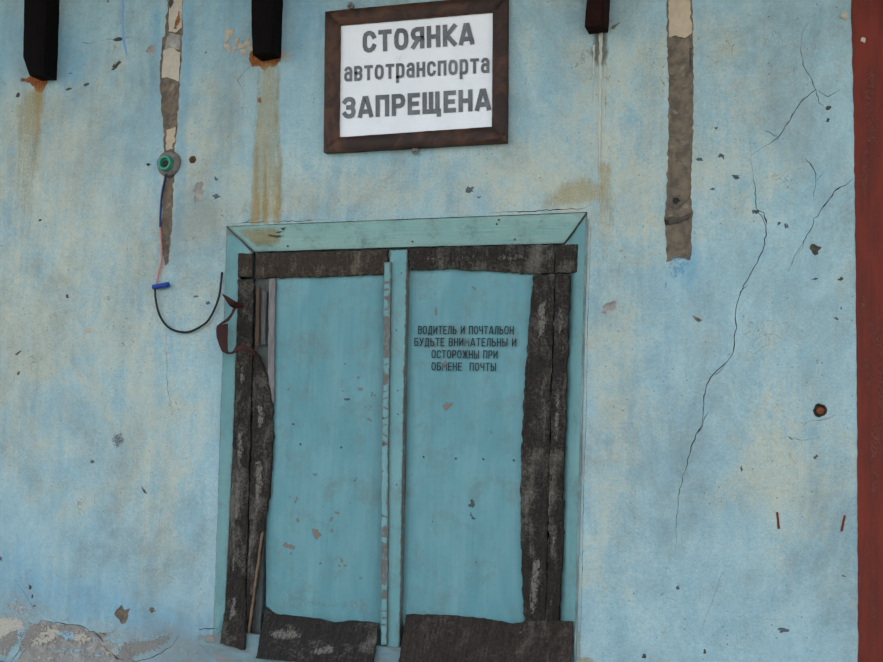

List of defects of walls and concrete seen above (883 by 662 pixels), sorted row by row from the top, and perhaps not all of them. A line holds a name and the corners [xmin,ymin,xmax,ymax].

rust [20,76,47,93]
spalling [145,0,183,152]
peeling [224,29,252,54]
rust [249,51,280,84]
spalling [664,0,703,262]
spalling [161,175,175,265]
crack [789,158,854,269]
crack [675,23,839,549]
peeling [0,585,172,662]